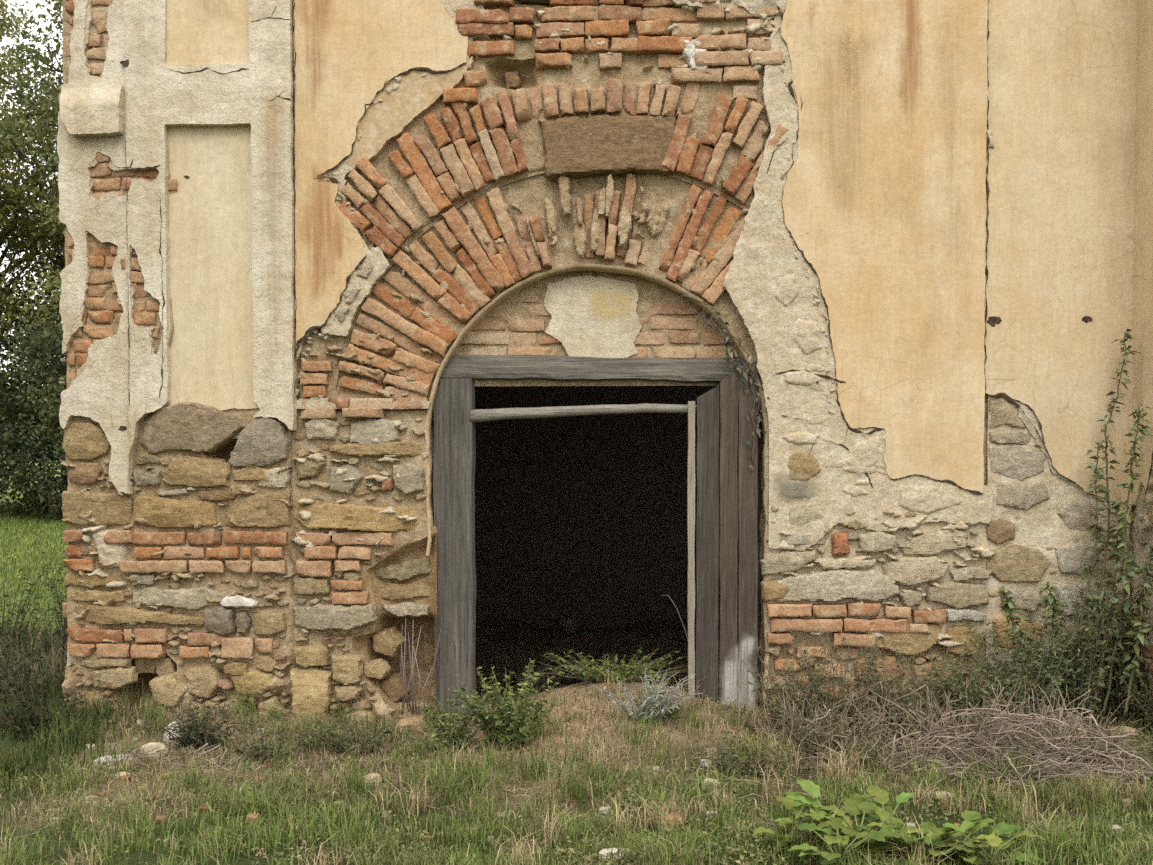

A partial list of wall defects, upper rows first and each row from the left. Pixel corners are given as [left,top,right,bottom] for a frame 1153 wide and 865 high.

flaking render [60,0,1153,729]